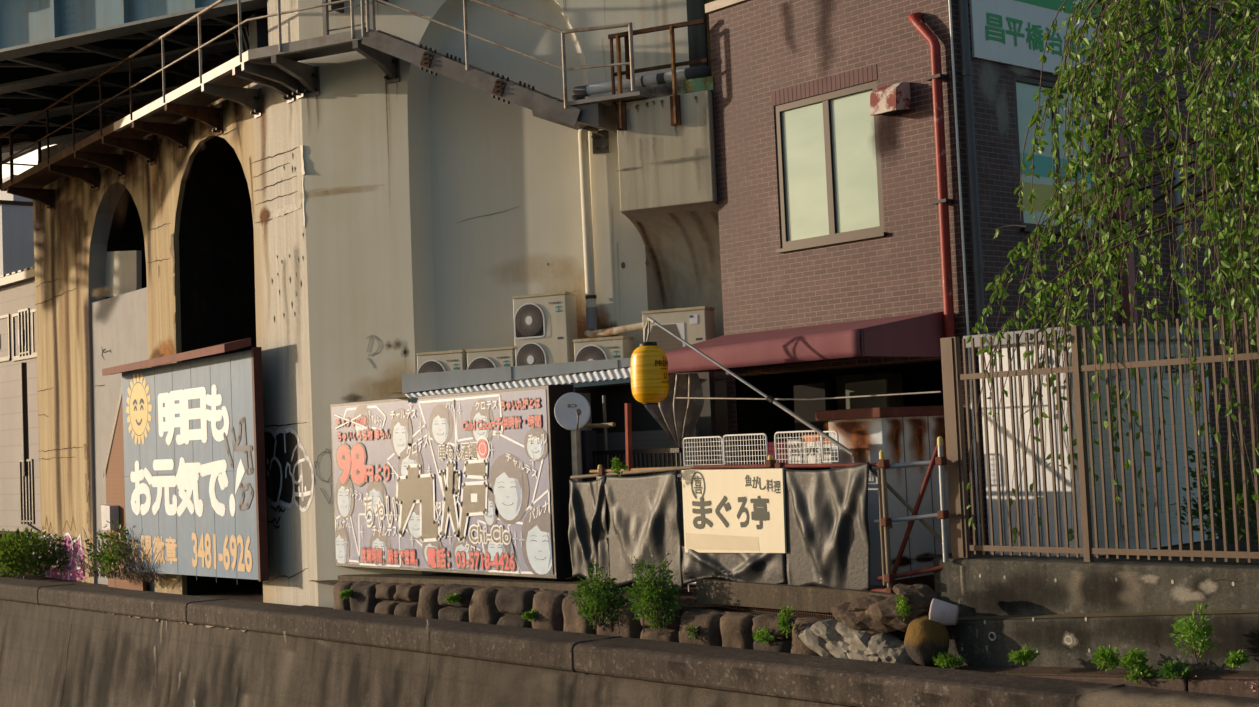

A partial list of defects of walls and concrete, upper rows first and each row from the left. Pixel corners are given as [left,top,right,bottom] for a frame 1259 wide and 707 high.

rust [146,118,204,258]
rust [36,201,91,525]
rust [832,421,870,463]
rust [889,417,947,463]